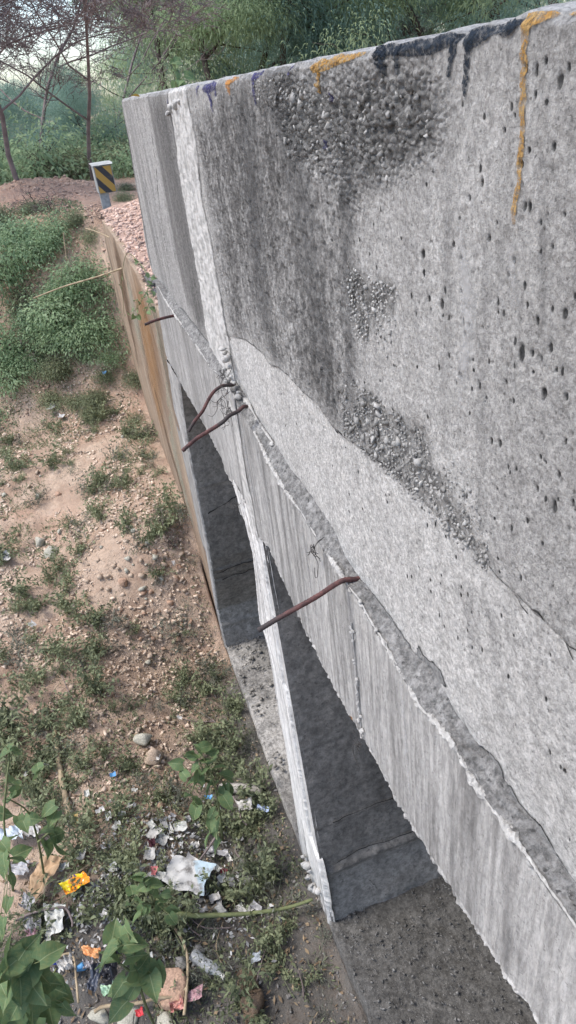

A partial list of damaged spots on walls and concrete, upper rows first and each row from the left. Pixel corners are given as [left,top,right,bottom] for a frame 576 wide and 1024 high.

crack [217,560,254,580]
spalling [373,594,446,687]
crack [513,591,544,620]
spalling [482,747,564,867]